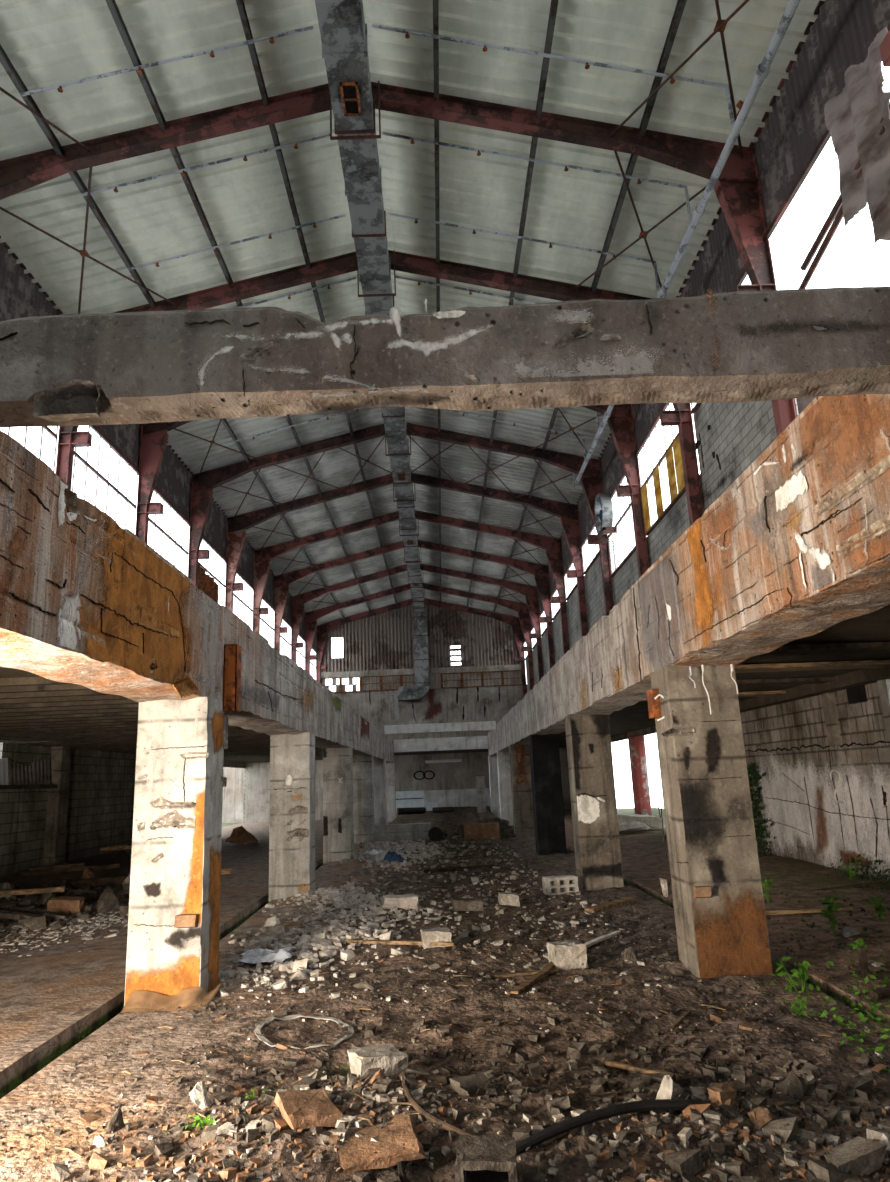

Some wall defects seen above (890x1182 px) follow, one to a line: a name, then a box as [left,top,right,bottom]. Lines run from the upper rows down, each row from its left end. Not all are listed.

spalling [31,379,101,422]
leakage [199,335,247,386]
leakage [287,307,478,355]
crack [0,478,86,534]
crack [762,496,770,533]
crack [800,498,862,537]
crack [0,552,186,672]
corrosion [78,517,192,685]
corrosion [686,504,734,648]
peeling [756,753,890,880]
corrosion [125,791,221,1004]
corrosion [694,892,773,978]